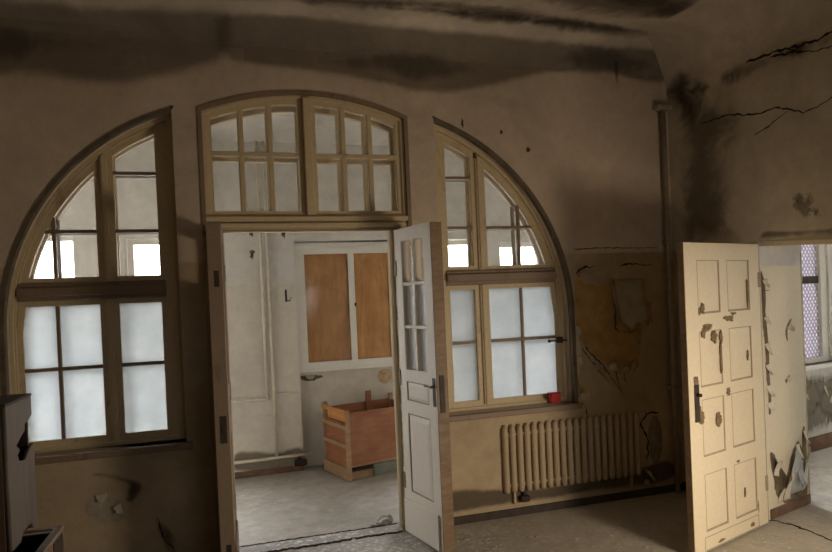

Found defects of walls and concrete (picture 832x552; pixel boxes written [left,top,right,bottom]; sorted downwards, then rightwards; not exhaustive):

leakage [572,0,677,16]
crack [746,31,832,63]
crack [719,97,832,135]
peeling [761,271,776,415]
peeling [770,426,811,503]
crack [769,520,832,541]